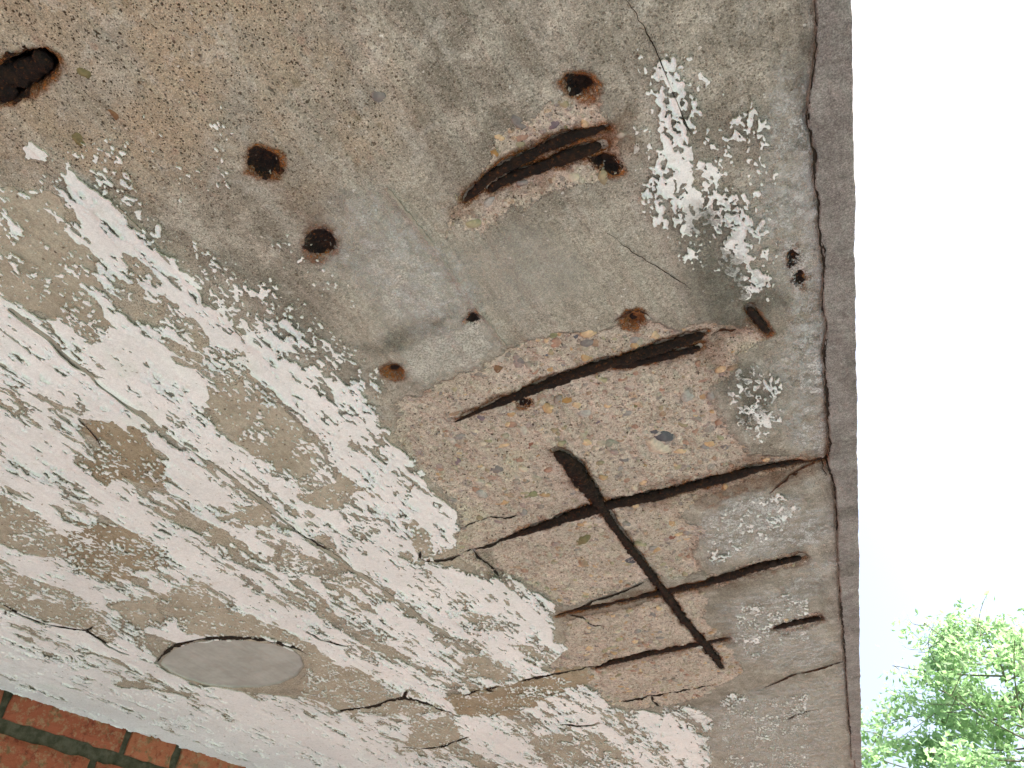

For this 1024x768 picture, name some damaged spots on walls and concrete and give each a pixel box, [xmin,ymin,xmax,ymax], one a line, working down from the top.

crack [627,1,692,135]
peeling [176,106,234,191]
rust [459,122,630,205]
peeling [446,48,811,302]
damp [696,207,780,324]
rust [454,328,713,420]
crack [767,1,852,759]
spalling [0,138,821,768]
rust [548,447,732,669]